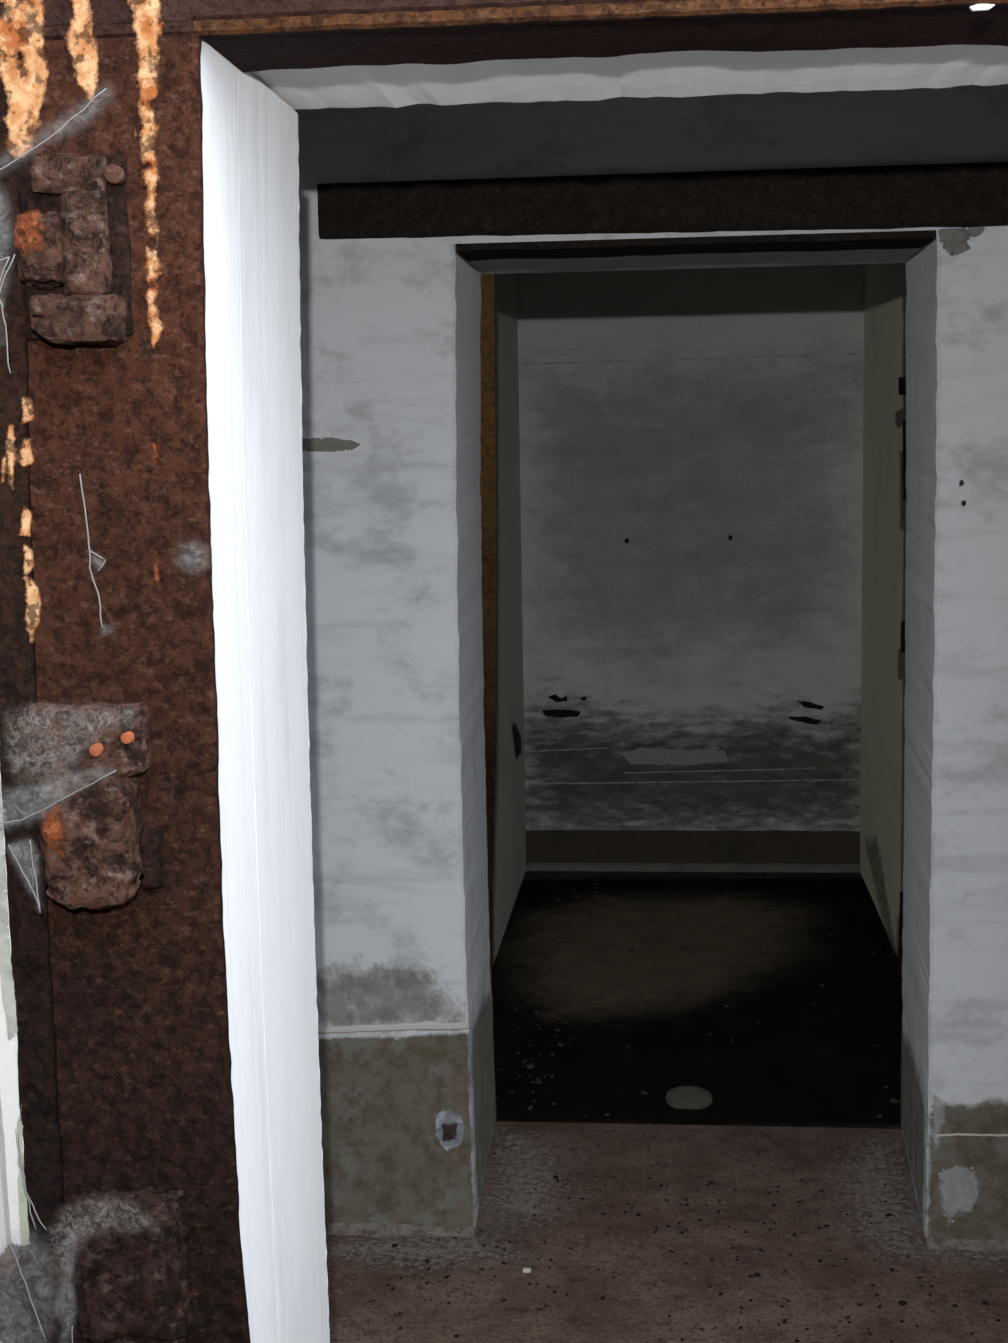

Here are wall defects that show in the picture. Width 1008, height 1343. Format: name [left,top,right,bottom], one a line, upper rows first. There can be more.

rust [0,0,50,158]
rust [64,0,99,102]
rust [14,210,47,251]
rust [127,0,164,348]
rust [1,397,35,482]
rust [18,507,42,643]
rust [42,803,65,858]
leakage [524,704,861,832]
peeling [0,780,18,1040]